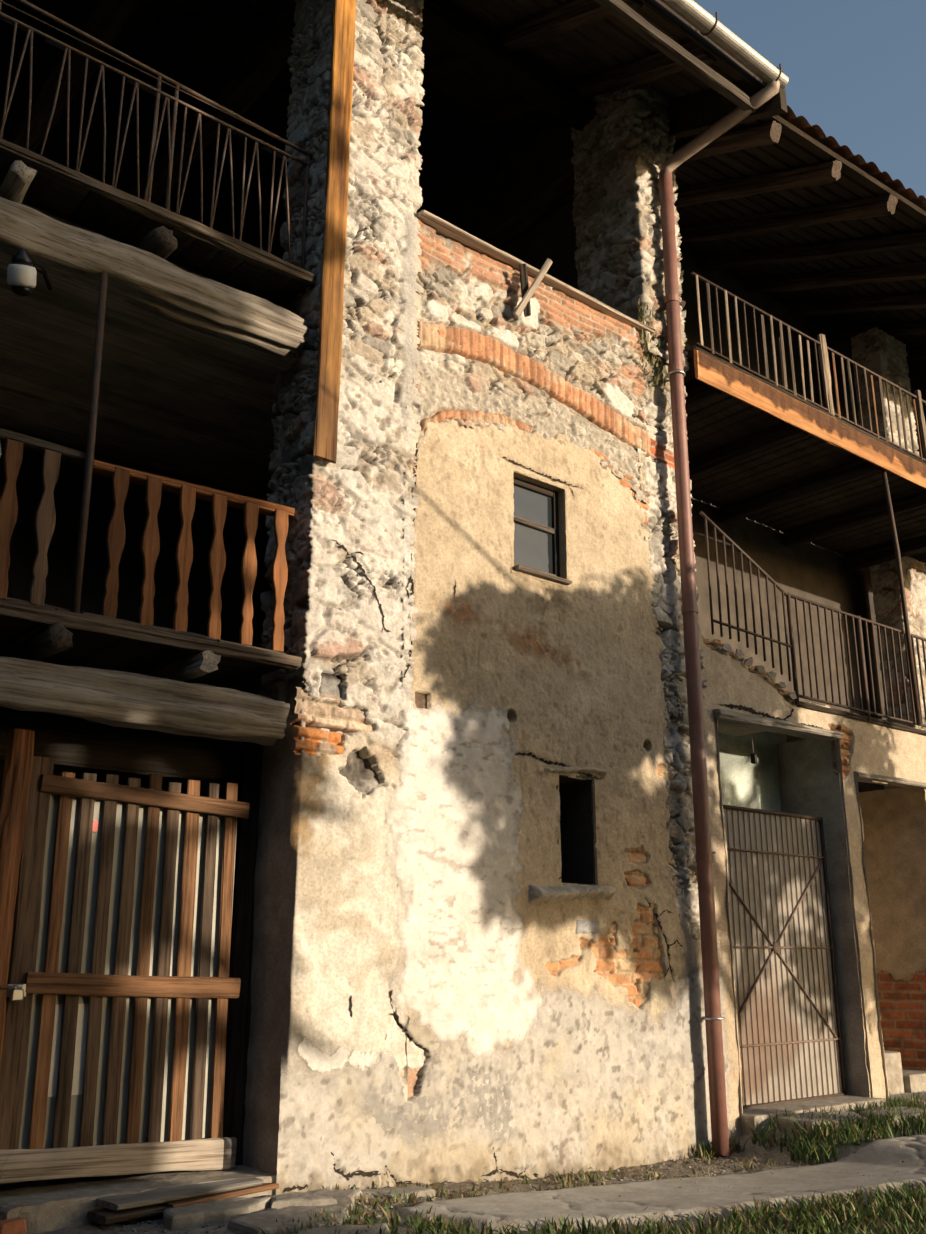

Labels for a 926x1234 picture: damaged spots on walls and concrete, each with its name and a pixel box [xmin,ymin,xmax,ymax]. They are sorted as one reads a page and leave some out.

peeling [290,687,552,1098]
flaking render [545,904,664,1008]
crack [385,990,428,1051]
flaking render [876,970,926,1070]